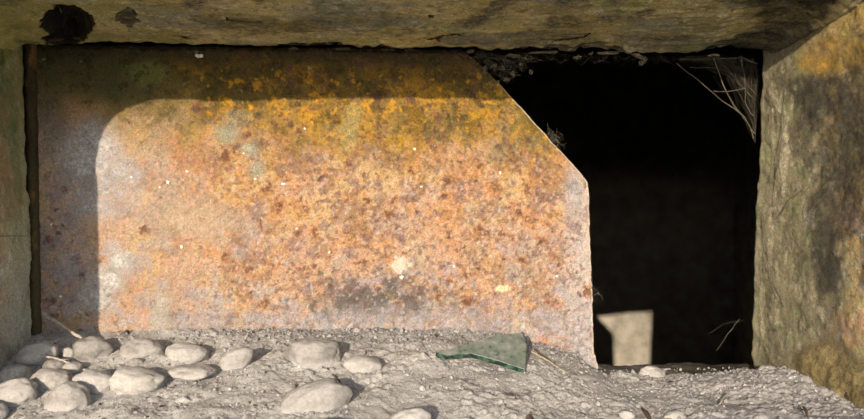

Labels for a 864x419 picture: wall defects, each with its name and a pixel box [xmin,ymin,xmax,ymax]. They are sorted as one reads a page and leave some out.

spalling [39,4,96,46]
damp [722,0,834,52]
damp [794,72,864,290]